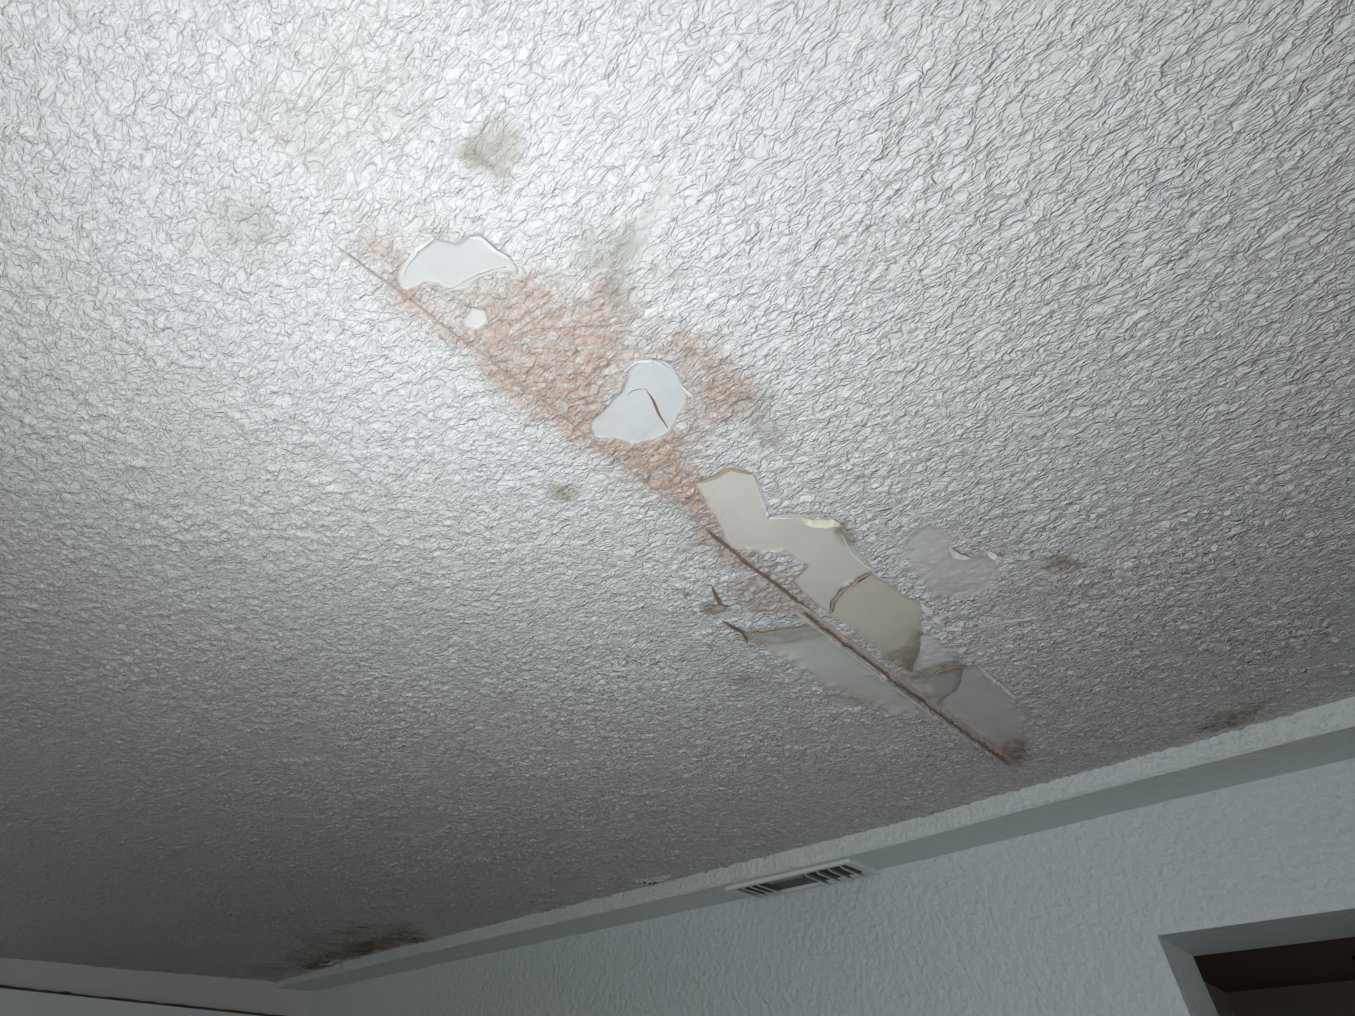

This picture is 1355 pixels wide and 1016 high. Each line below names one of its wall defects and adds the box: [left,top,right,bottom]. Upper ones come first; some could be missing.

peeling [462,308,488,329]
peeling [589,359,694,444]
crack [334,245,1012,766]
peeling [690,464,872,611]
peeling [949,547,1005,560]
peeling [742,625,1028,754]